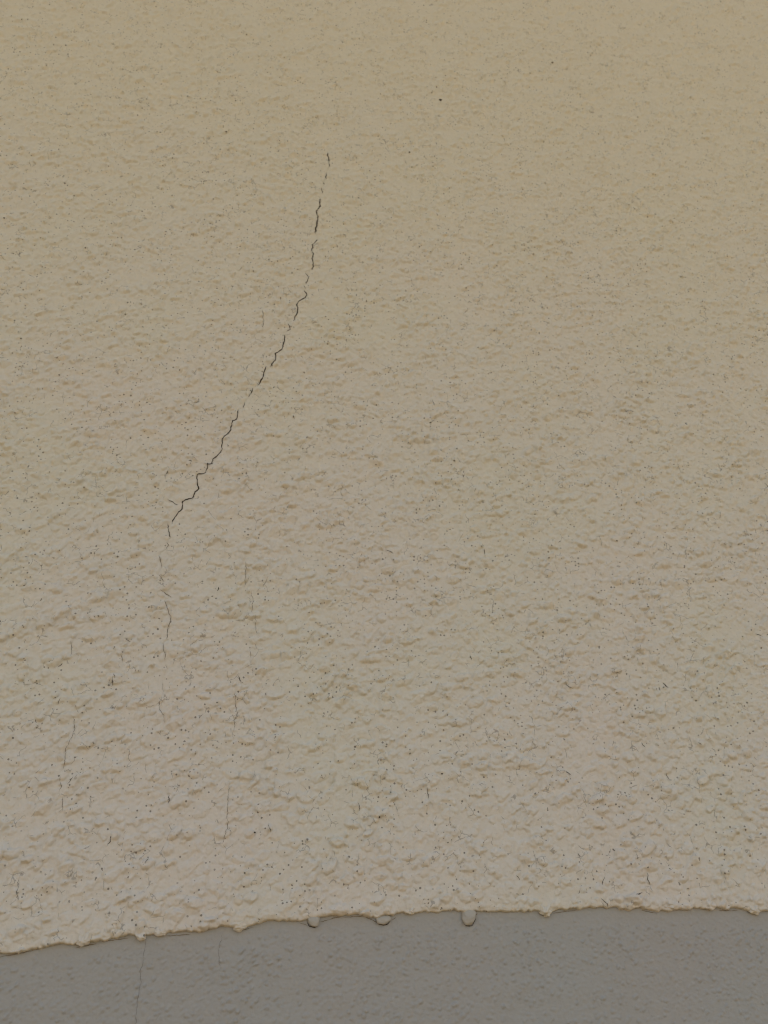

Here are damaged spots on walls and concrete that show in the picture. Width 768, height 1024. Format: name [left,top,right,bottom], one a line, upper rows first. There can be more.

crack [159,152,330,715]